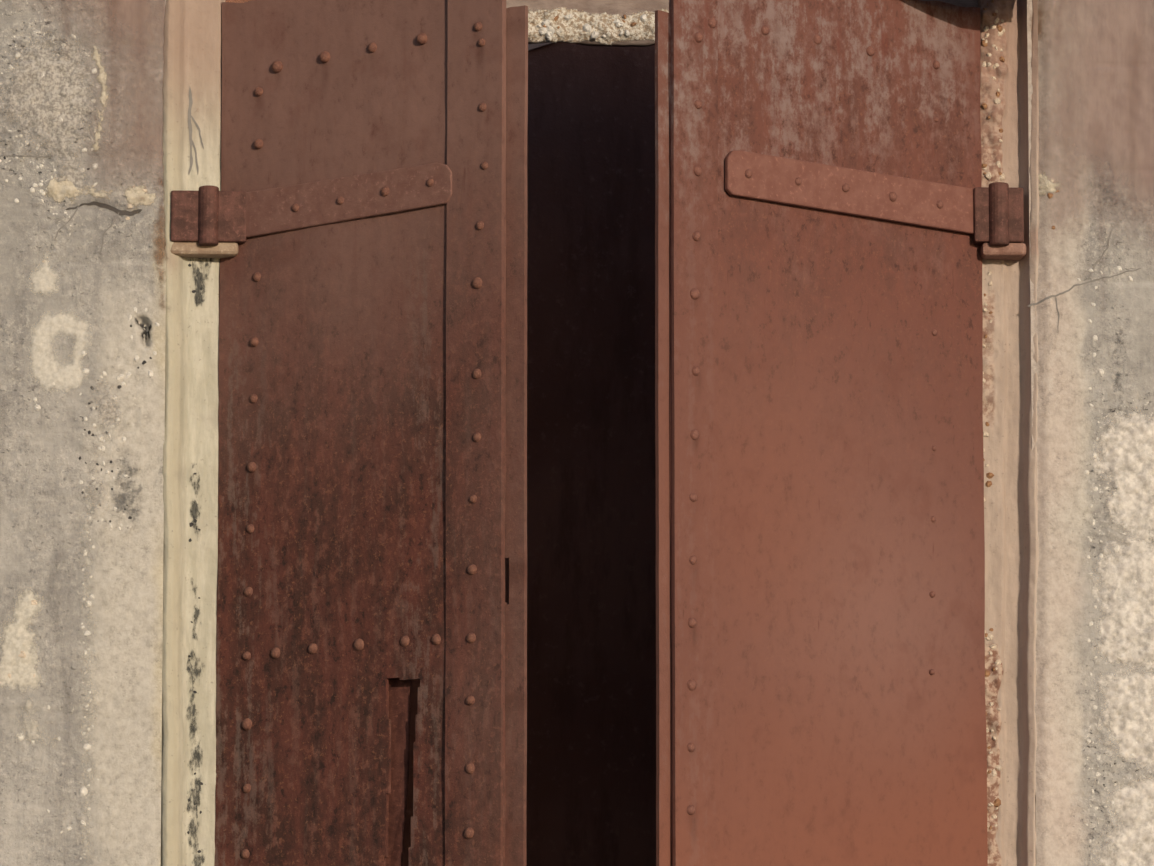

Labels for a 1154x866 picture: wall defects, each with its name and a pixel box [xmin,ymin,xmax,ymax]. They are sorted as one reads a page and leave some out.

spalling [981,0,1005,119]
crack [0,155,156,253]
crack [1027,229,1141,326]
spalling [79,307,160,751]
peeling [60,766,99,860]
spalling [987,798,1001,830]